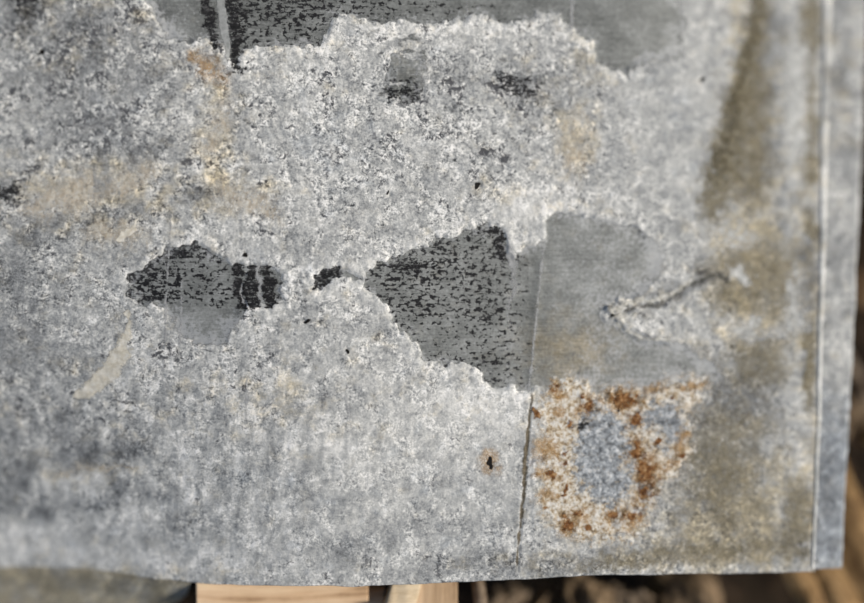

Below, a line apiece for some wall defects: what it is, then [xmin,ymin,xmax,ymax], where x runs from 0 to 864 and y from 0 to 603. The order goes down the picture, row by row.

peeling [144,0,687,107]
water stain [698,0,767,248]
water stain [781,0,820,185]
peeling [126,240,283,346]
peeling [312,211,725,398]
crack [605,273,727,342]
crack [516,396,533,564]
rust [532,372,708,547]